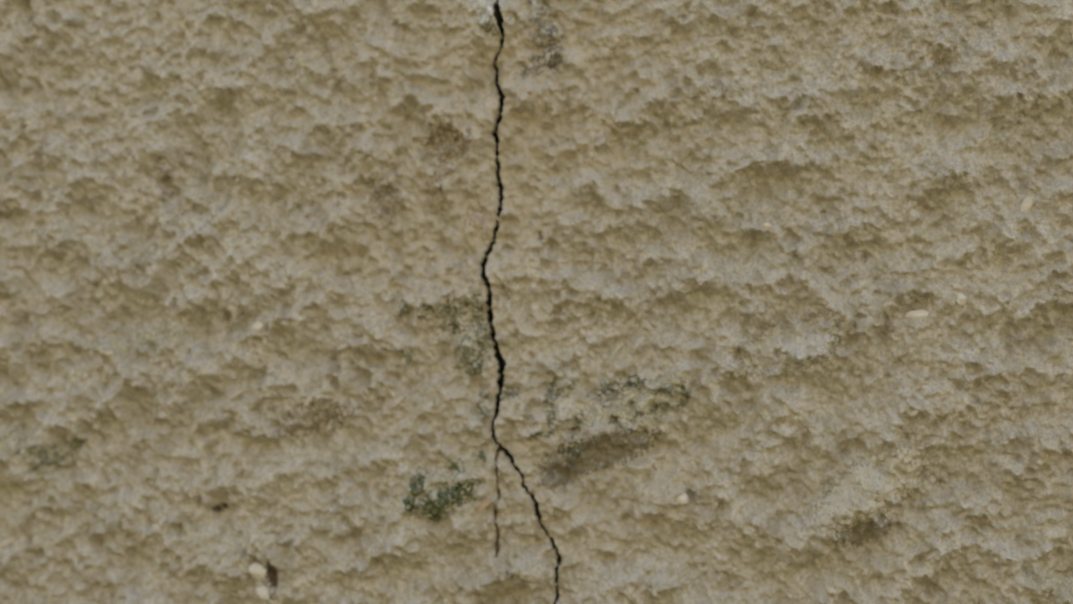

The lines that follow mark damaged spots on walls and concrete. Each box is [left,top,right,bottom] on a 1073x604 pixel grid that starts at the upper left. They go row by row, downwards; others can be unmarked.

crack [481,2,561,604]